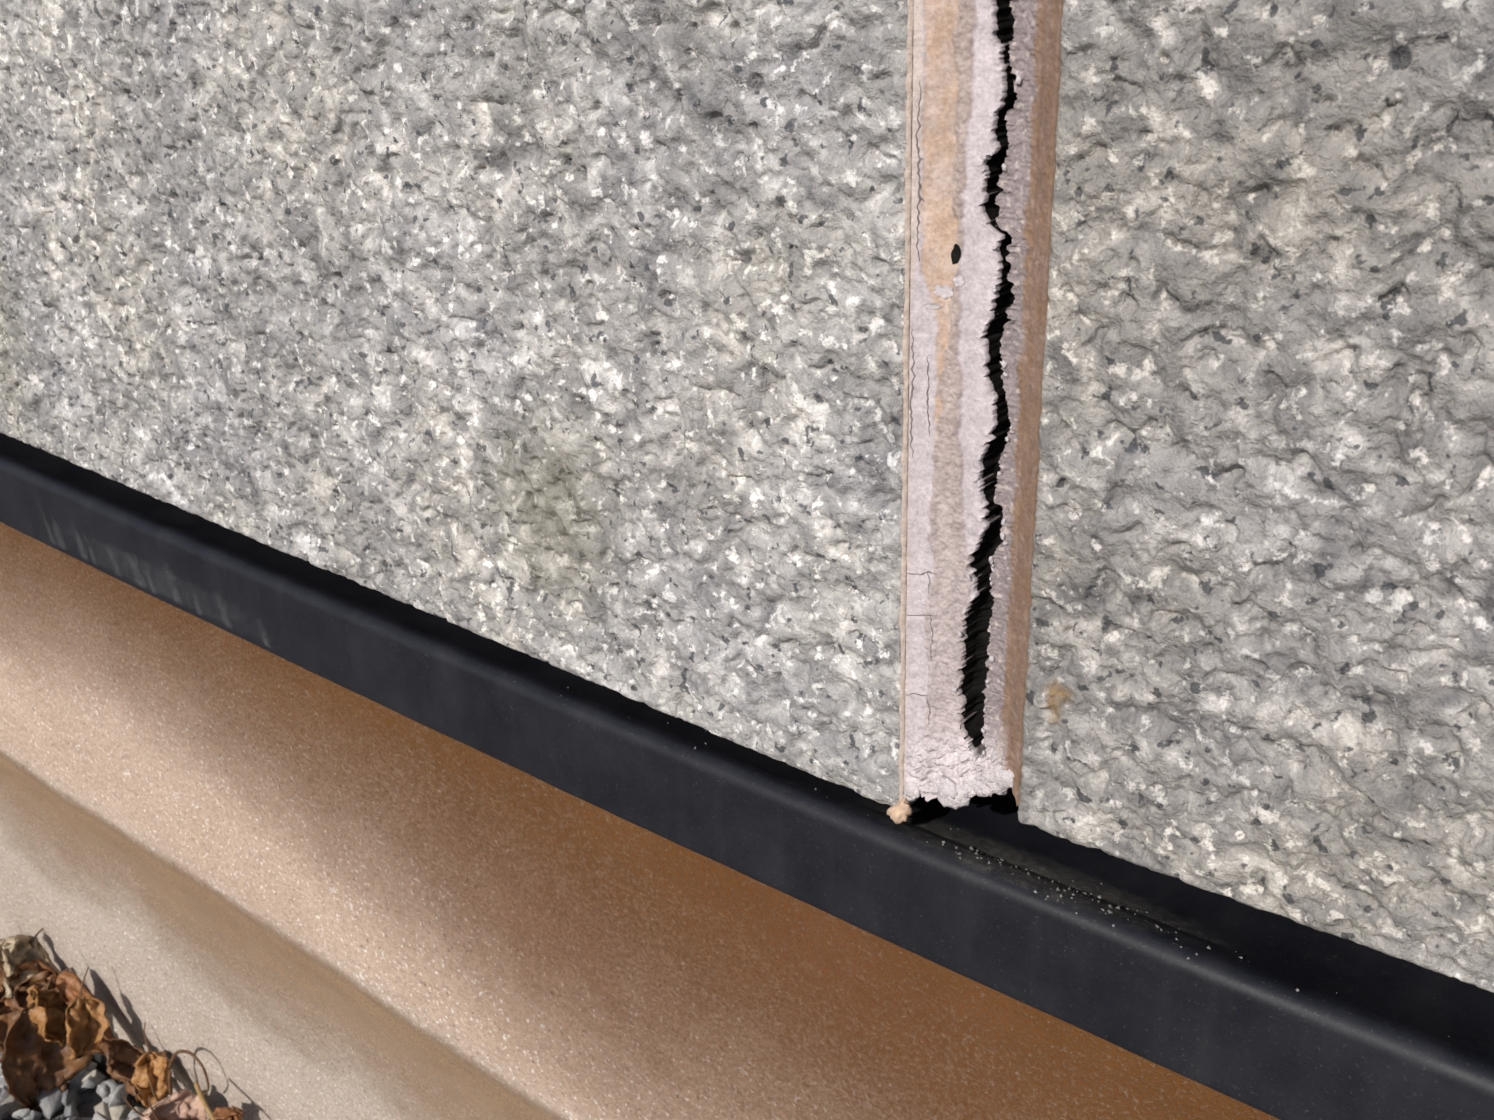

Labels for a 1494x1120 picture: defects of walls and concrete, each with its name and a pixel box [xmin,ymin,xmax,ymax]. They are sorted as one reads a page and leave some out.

crack [906,0,1022,755]